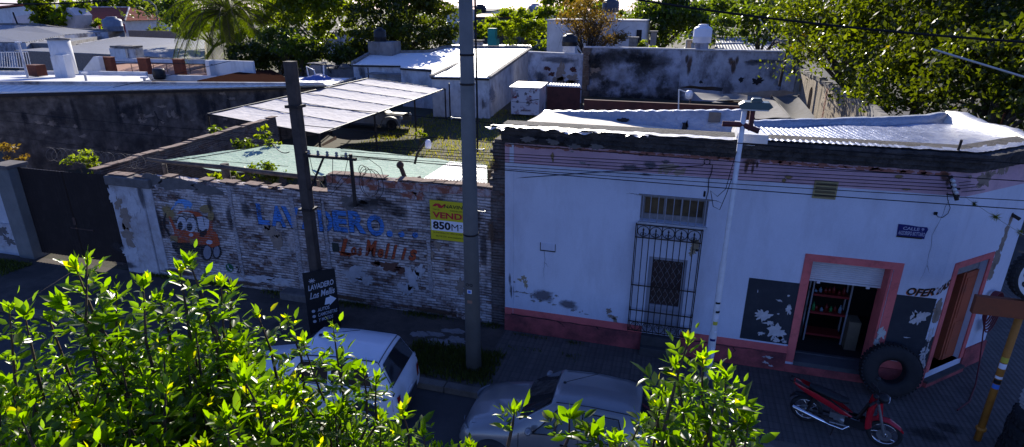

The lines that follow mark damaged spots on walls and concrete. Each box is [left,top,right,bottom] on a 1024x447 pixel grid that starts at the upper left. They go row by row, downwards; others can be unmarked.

water stain [588,52,669,68]
water stain [587,81,678,100]
peeling [107,188,140,262]
peeling [755,295,792,343]
peeling [909,298,943,369]